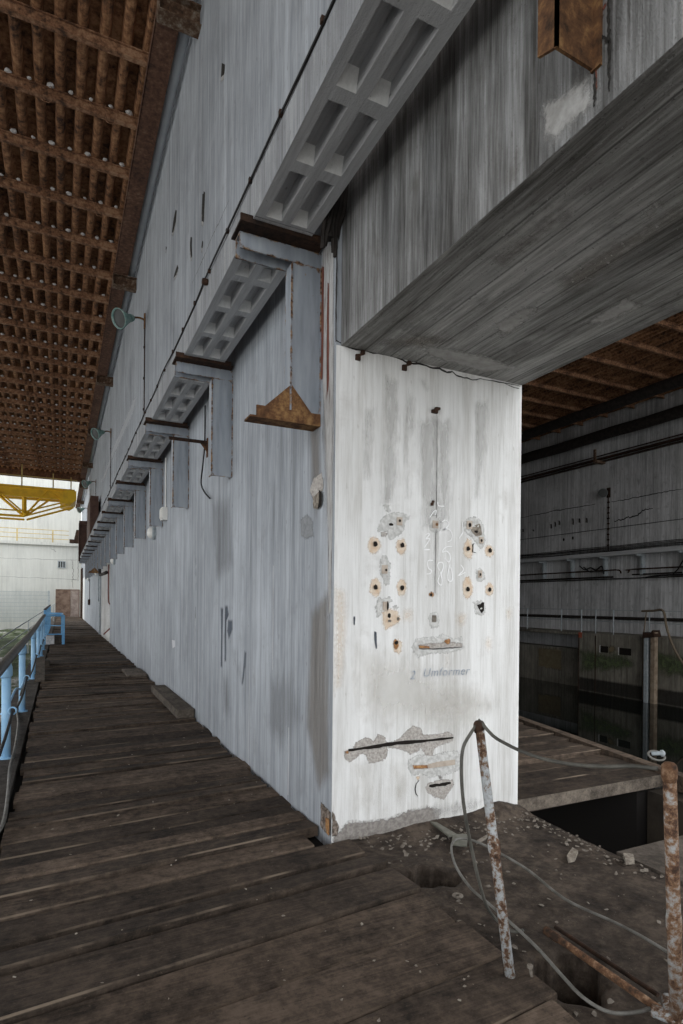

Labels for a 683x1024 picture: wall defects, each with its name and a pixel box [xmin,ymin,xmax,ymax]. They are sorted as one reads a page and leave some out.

spalling [310,473,324,509]
spalling [377,504,410,540]
spalling [463,516,486,553]
peeling [375,555,400,630]
spalling [472,600,485,616]
spalling [411,612,464,657]
peeling [344,726,460,800]
spalling [359,811,664,879]